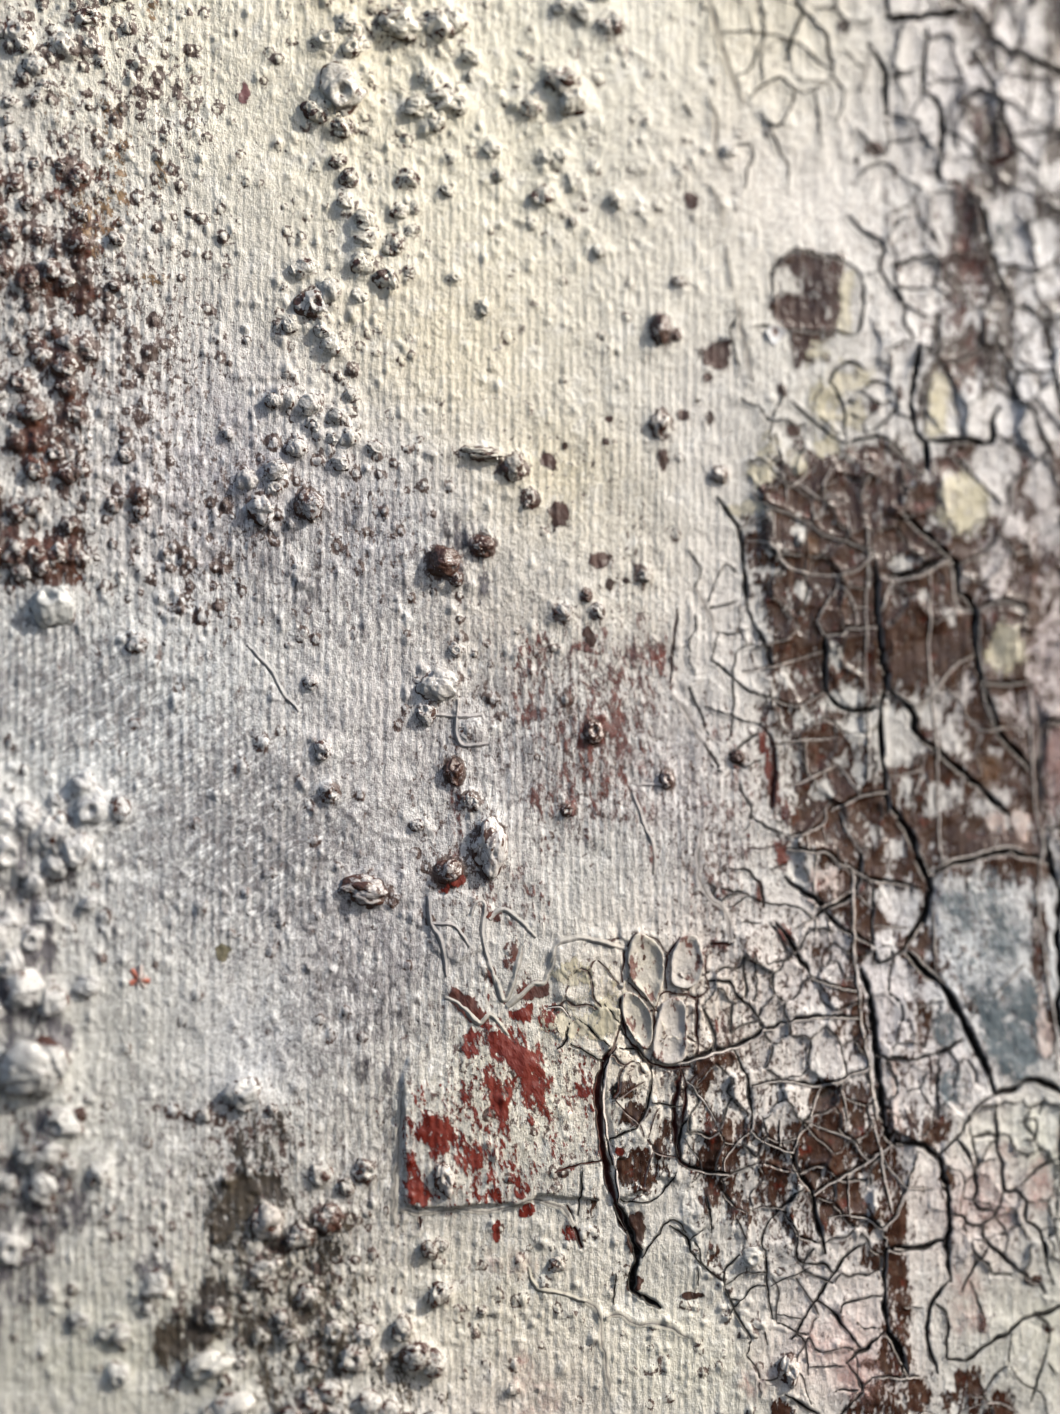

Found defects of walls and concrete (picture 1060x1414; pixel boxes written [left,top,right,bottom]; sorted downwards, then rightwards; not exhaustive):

corrosion [35,93,135,259]
corrosion [154,142,168,190]
peeling [589,551,642,591]
crack [390,0,1060,1414]
peeling [607,0,1060,1414]